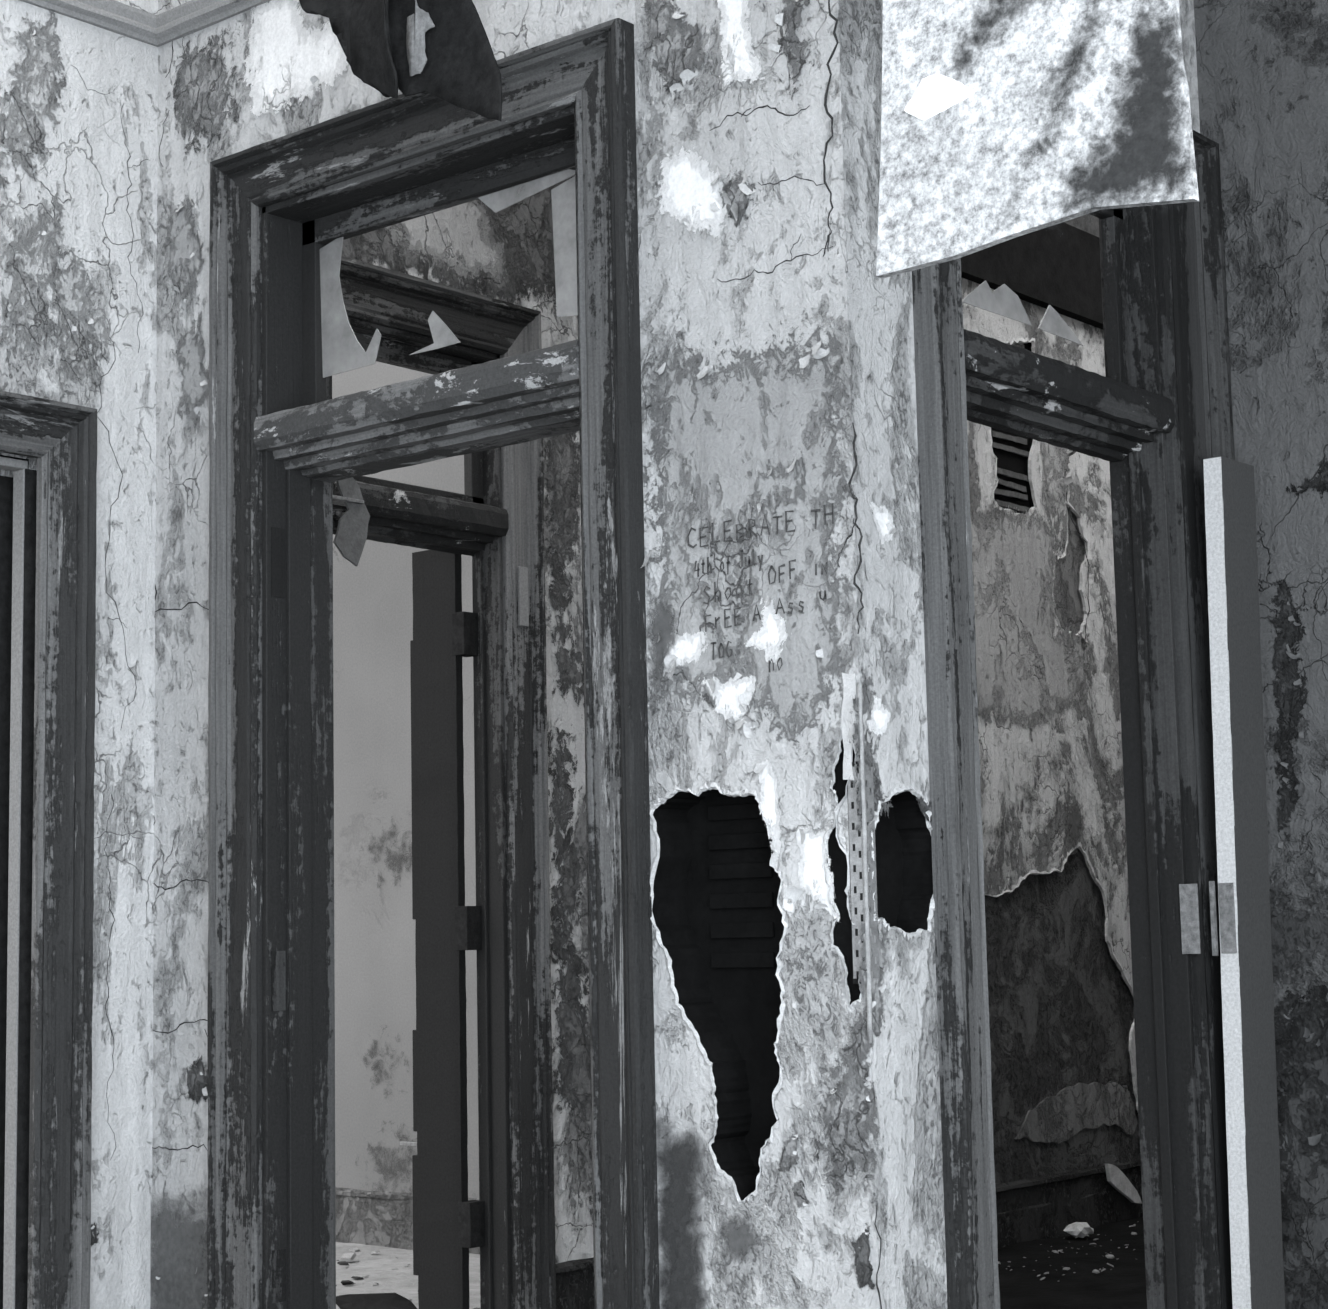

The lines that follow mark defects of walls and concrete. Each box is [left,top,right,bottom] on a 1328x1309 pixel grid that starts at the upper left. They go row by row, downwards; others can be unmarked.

peeling [0,191,111,387]
peeling [654,145,756,241]
peeling [637,0,814,109]
crack [709,0,839,282]
crack [155,585,209,612]
peeling [970,427,1094,729]
peeling [641,321,935,1208]
crack [97,794,155,1160]
crack [153,1019,207,1035]
crack [154,879,208,890]
flaking render [985,841,1140,1184]
crack [152,1143,207,1151]